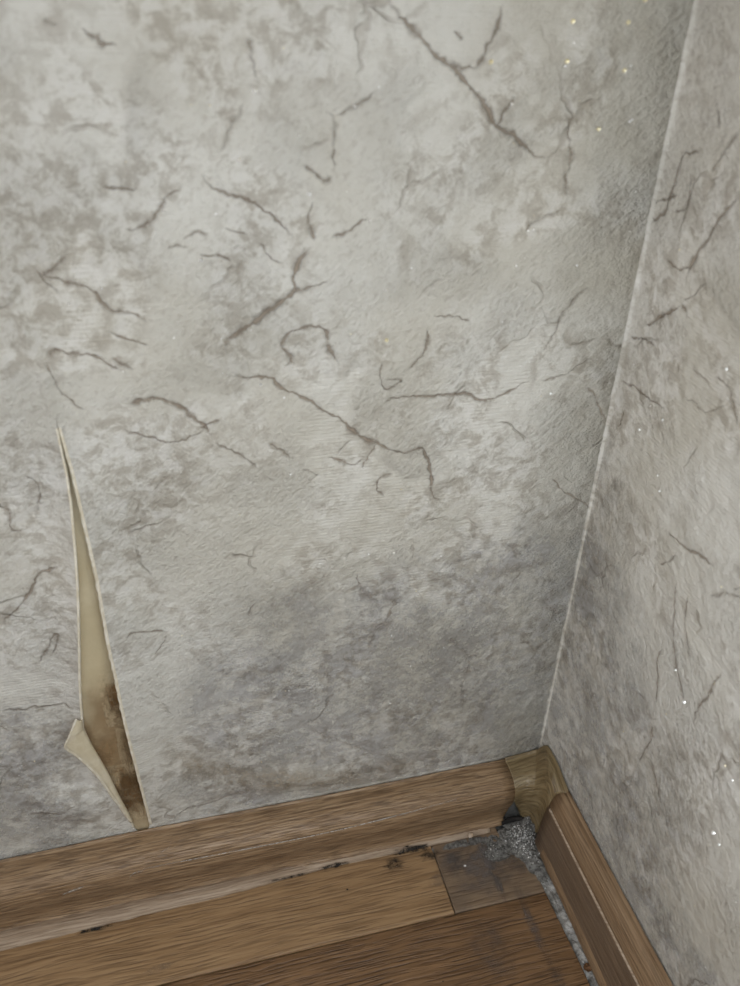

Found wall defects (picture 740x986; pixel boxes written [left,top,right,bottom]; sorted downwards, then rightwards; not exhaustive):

flaking render [57,424,150,831]